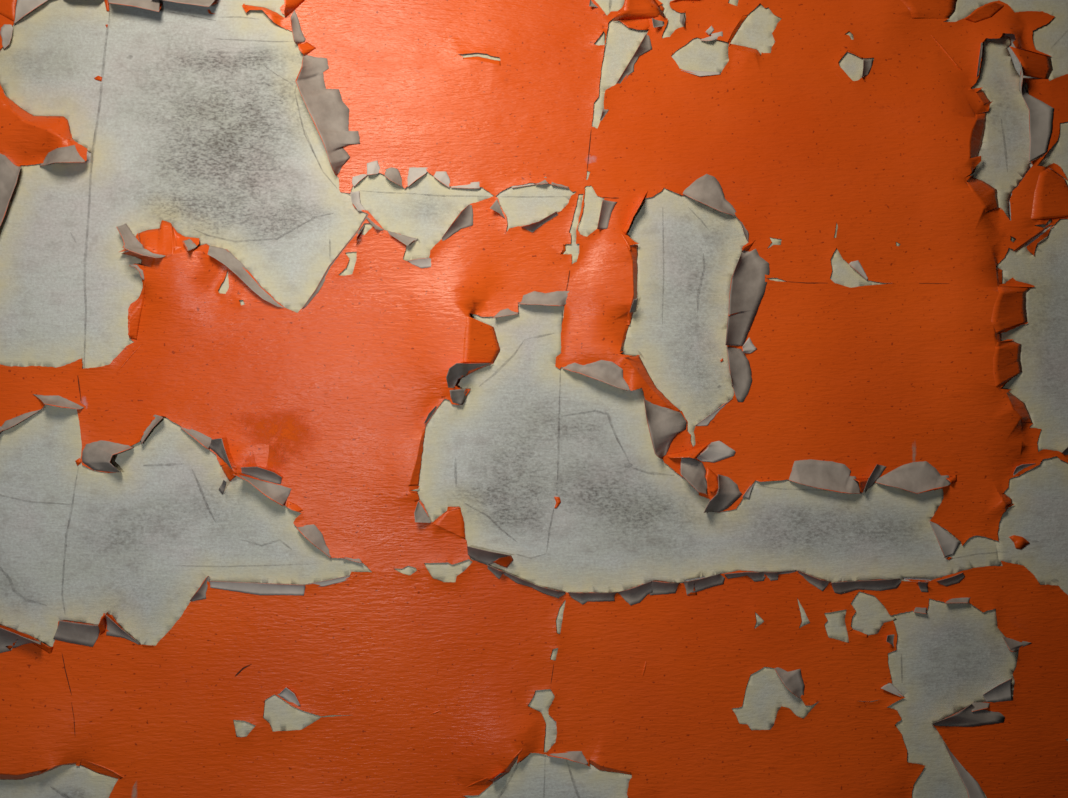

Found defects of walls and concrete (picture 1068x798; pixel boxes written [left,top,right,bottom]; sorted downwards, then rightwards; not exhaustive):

peeling [0,0,617,369]
peeling [0,394,372,654]
peeling [395,0,1068,798]
peeling [0,760,122,798]
peeling [233,688,350,737]